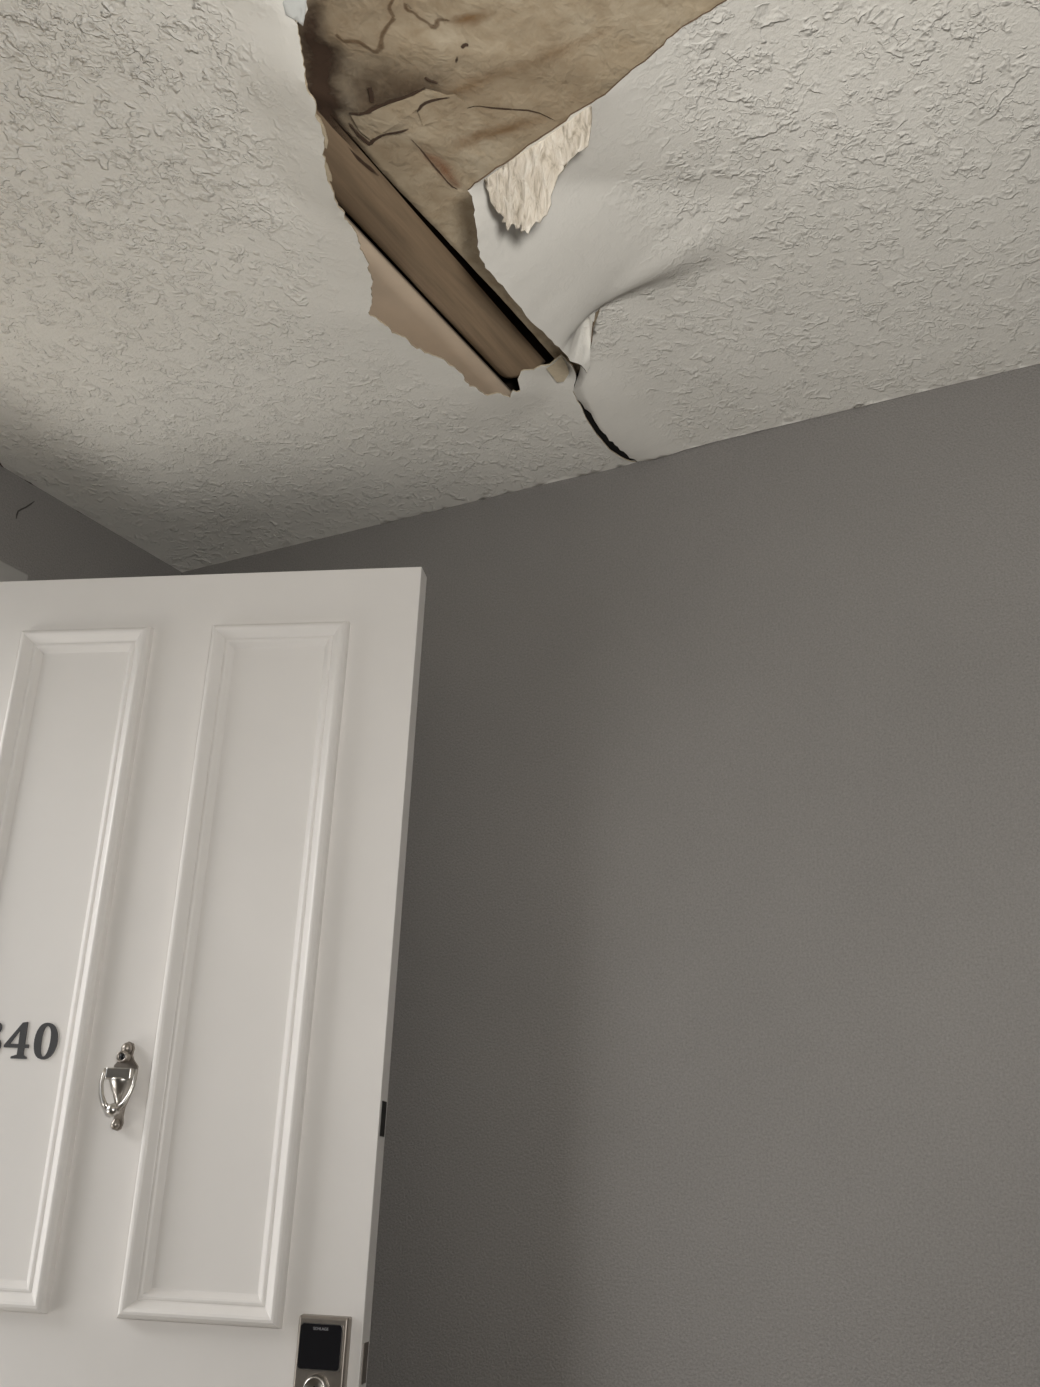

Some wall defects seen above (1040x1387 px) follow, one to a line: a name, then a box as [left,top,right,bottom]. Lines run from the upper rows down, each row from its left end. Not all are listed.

crack [574,382,634,460]